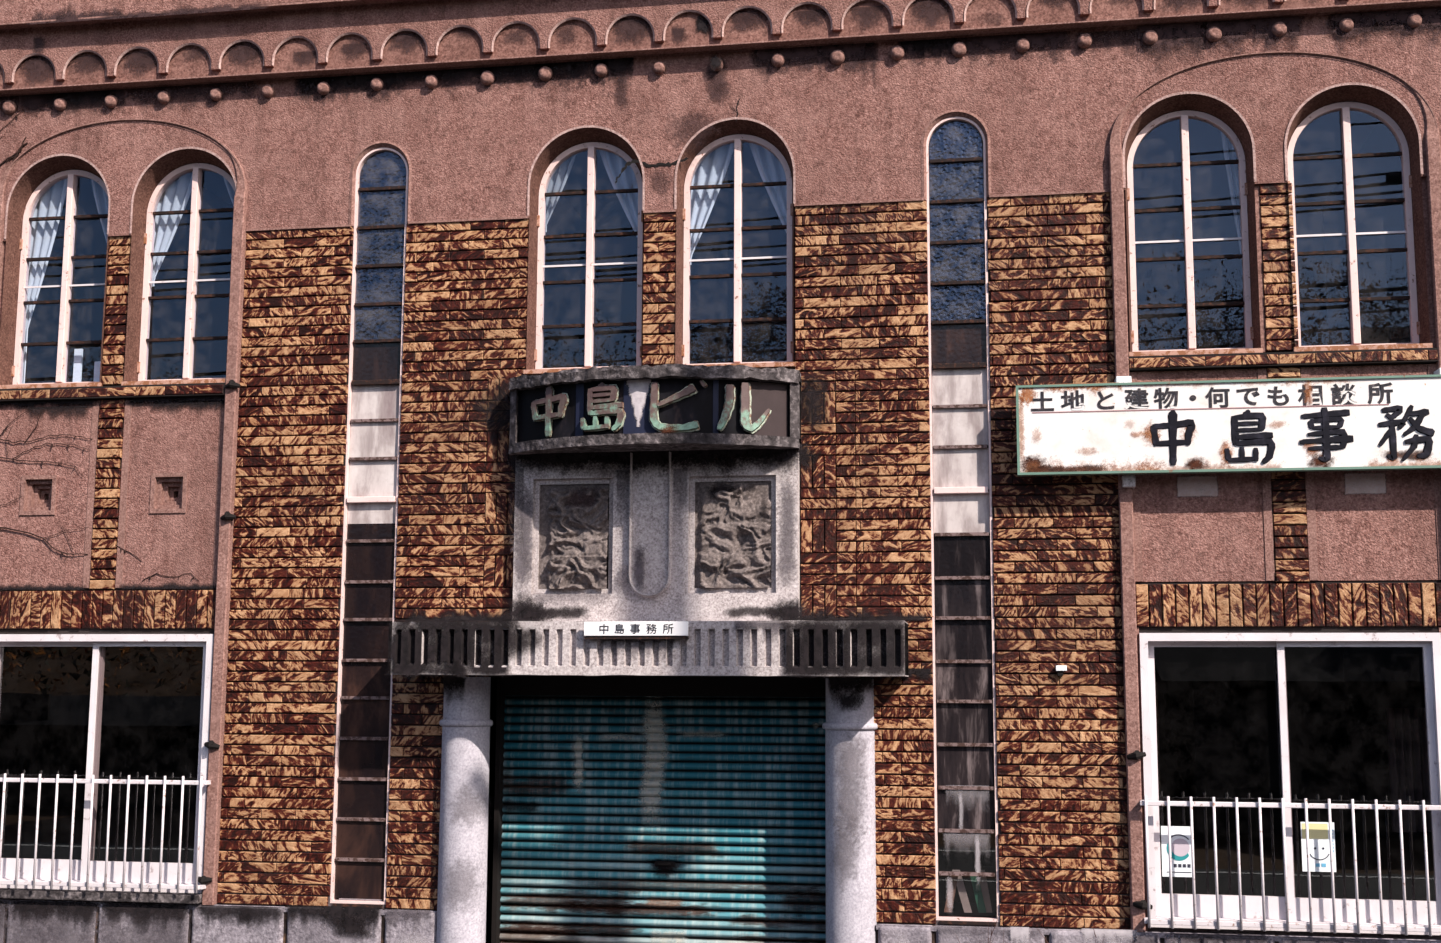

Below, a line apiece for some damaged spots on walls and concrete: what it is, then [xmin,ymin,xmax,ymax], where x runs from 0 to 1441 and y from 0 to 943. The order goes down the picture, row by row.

water stain [707,61,729,102]
corrosion [1278,376,1345,403]
corrosion [1019,382,1157,476]
corrosion [1185,441,1232,469]
corrosion [1305,444,1334,467]
corrosion [1370,450,1441,469]
corrosion [629,841,716,854]
corrosion [502,890,714,937]
corrosion [733,892,826,943]